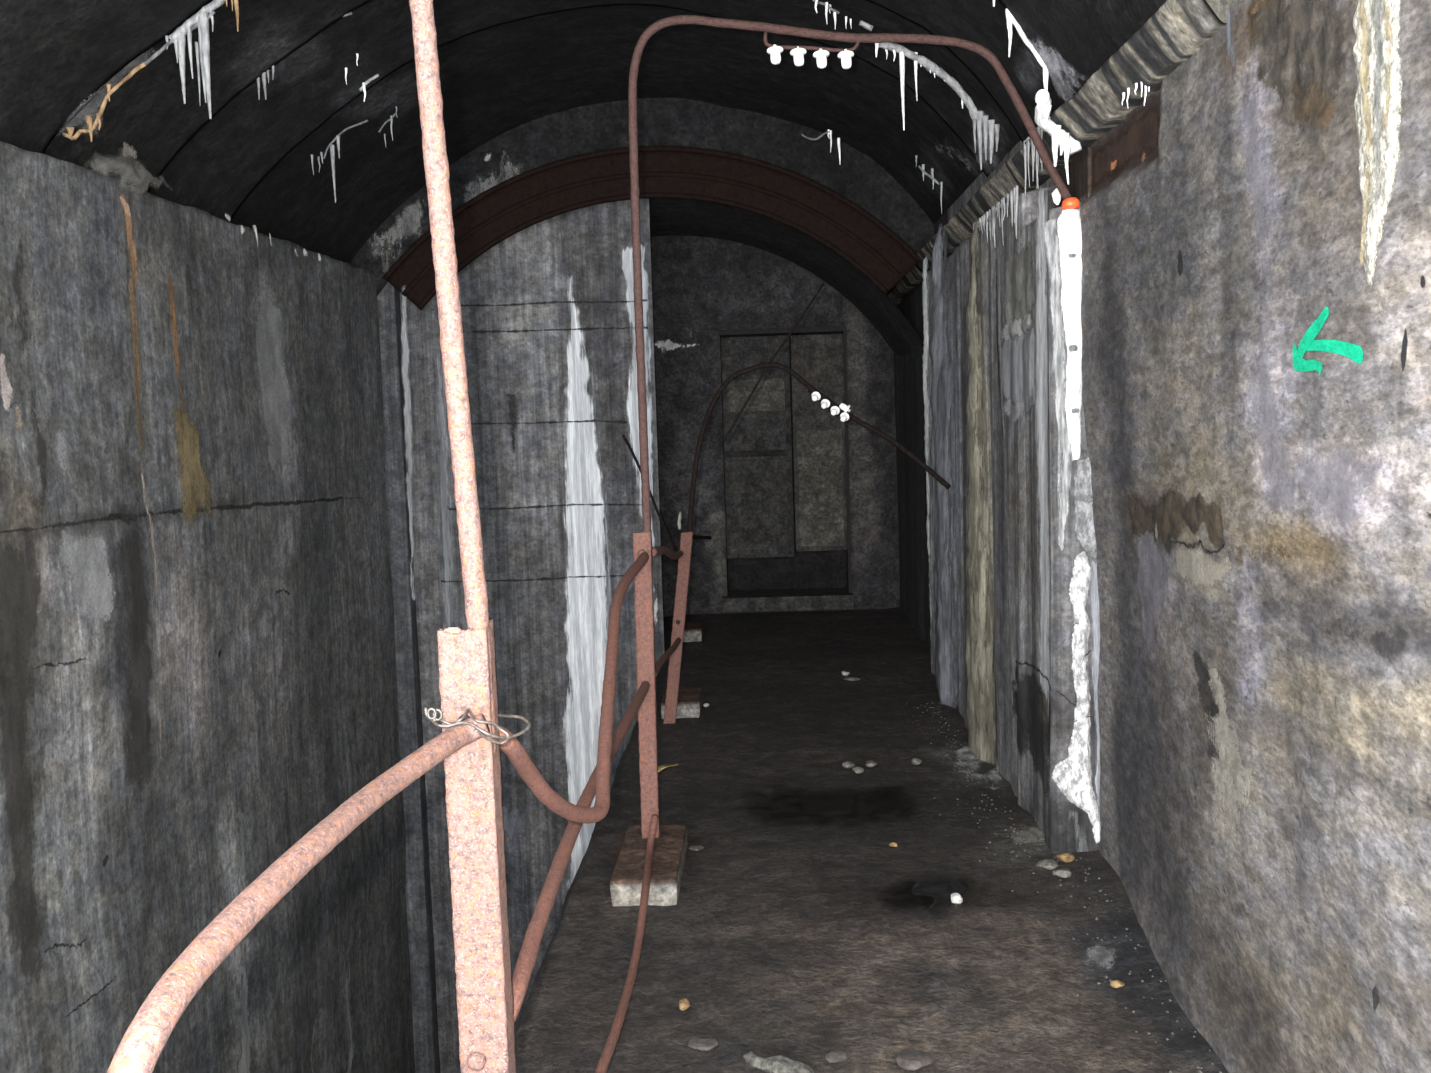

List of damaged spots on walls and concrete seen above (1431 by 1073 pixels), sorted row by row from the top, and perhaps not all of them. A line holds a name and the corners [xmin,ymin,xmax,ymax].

water stain [257,66,275,100]
water stain [875,43,1000,170]
water stain [1005,8,1084,102]
water stain [1353,0,1402,312]
water stain [563,279,612,888]
water stain [922,219,1002,789]
spalling [1074,457,1097,558]
flaking render [1128,490,1231,653]
water stain [1012,660,1076,796]